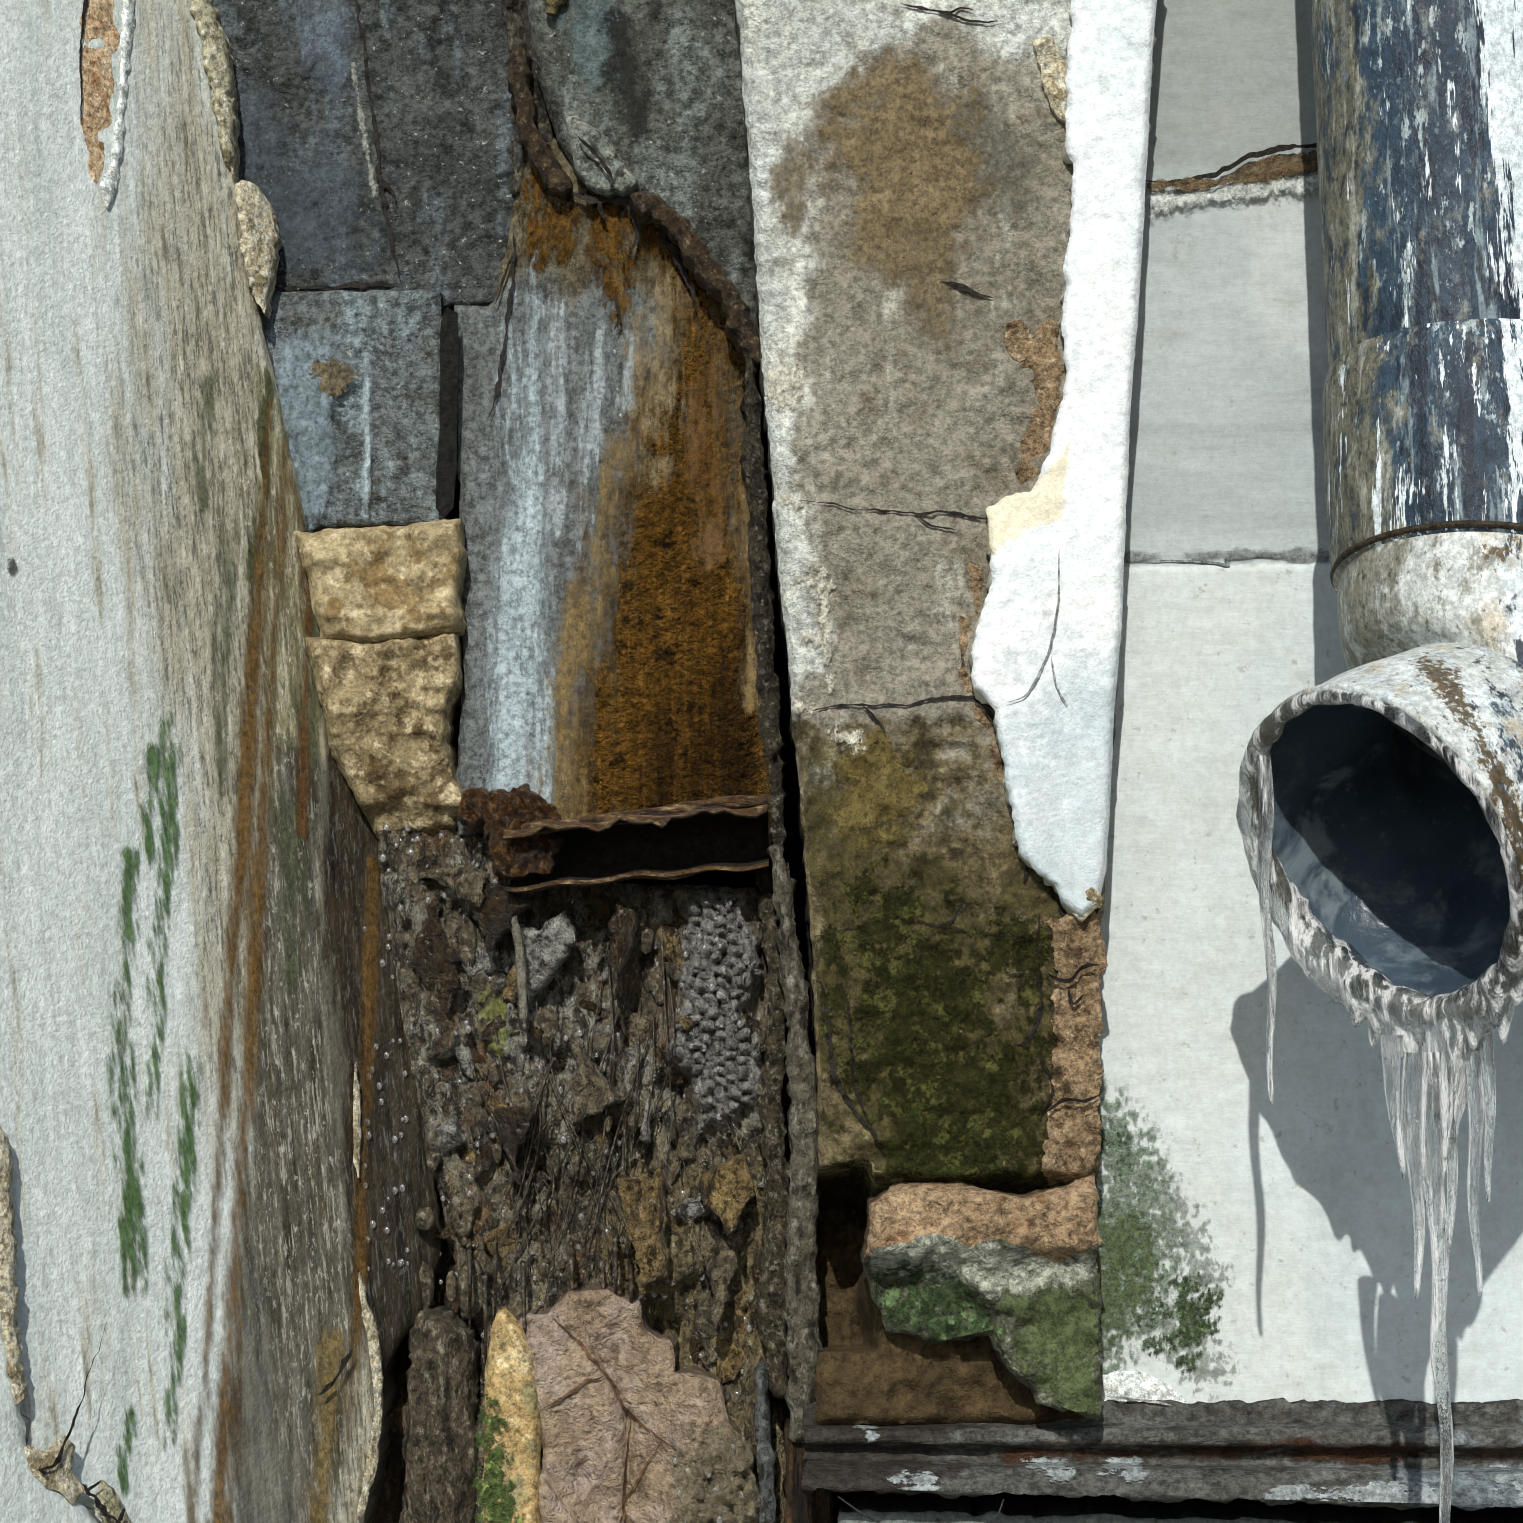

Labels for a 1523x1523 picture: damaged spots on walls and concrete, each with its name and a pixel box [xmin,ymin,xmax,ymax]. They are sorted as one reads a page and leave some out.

spalling [79,0,136,210]
damp [770,47,1039,339]
crack [1146,143,1319,218]
rust [515,164,771,826]
crack [801,500,986,530]
damp [793,564,836,717]
damp [827,720,867,754]
crack [803,695,996,736]
flaking render [860,0,1188,1421]
rust [193,404,312,1523]
rust [309,857,378,1523]
crack [38,1322,125,1523]